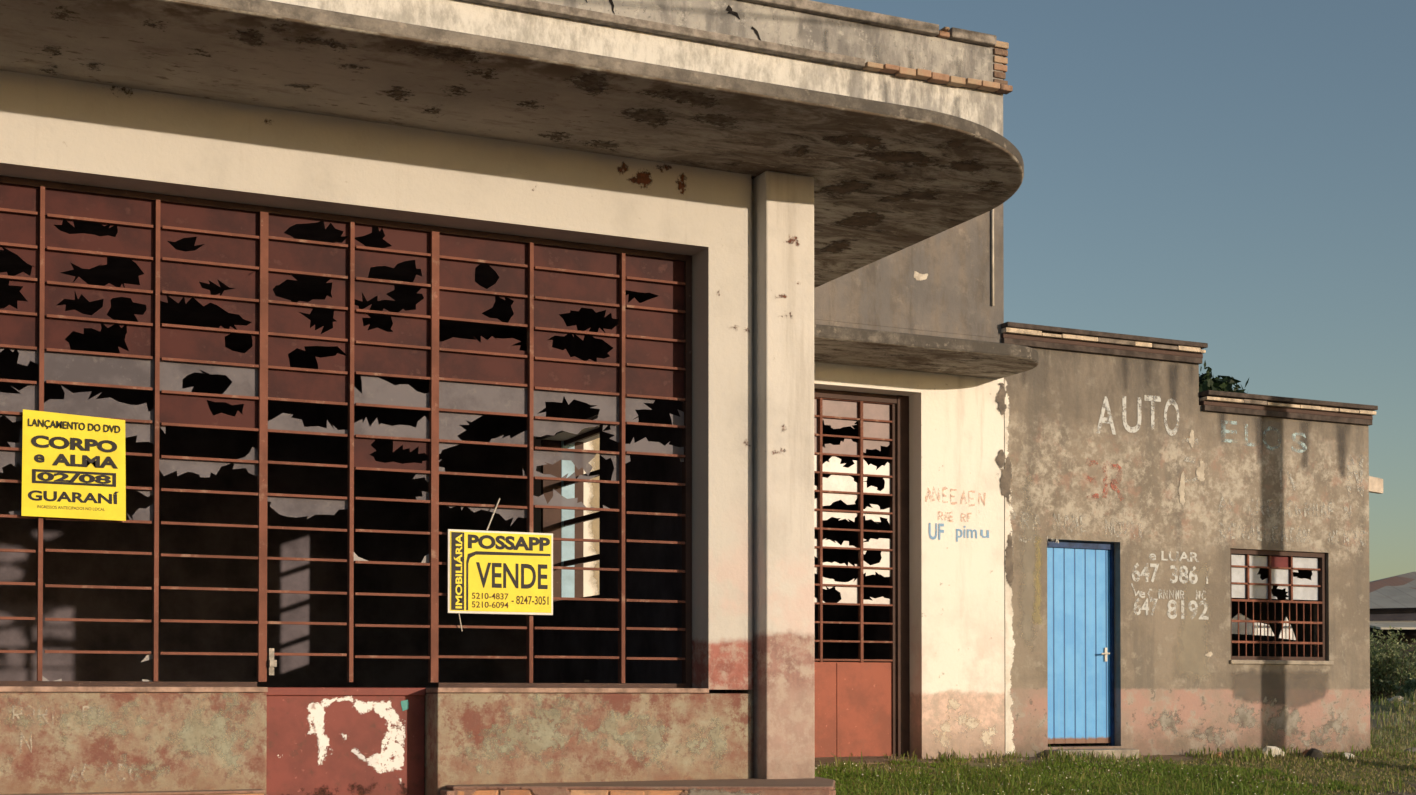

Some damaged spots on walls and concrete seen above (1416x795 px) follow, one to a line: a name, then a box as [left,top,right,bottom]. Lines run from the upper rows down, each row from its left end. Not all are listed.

peeling [457,695,727,795]
damp [1148,672,1348,747]